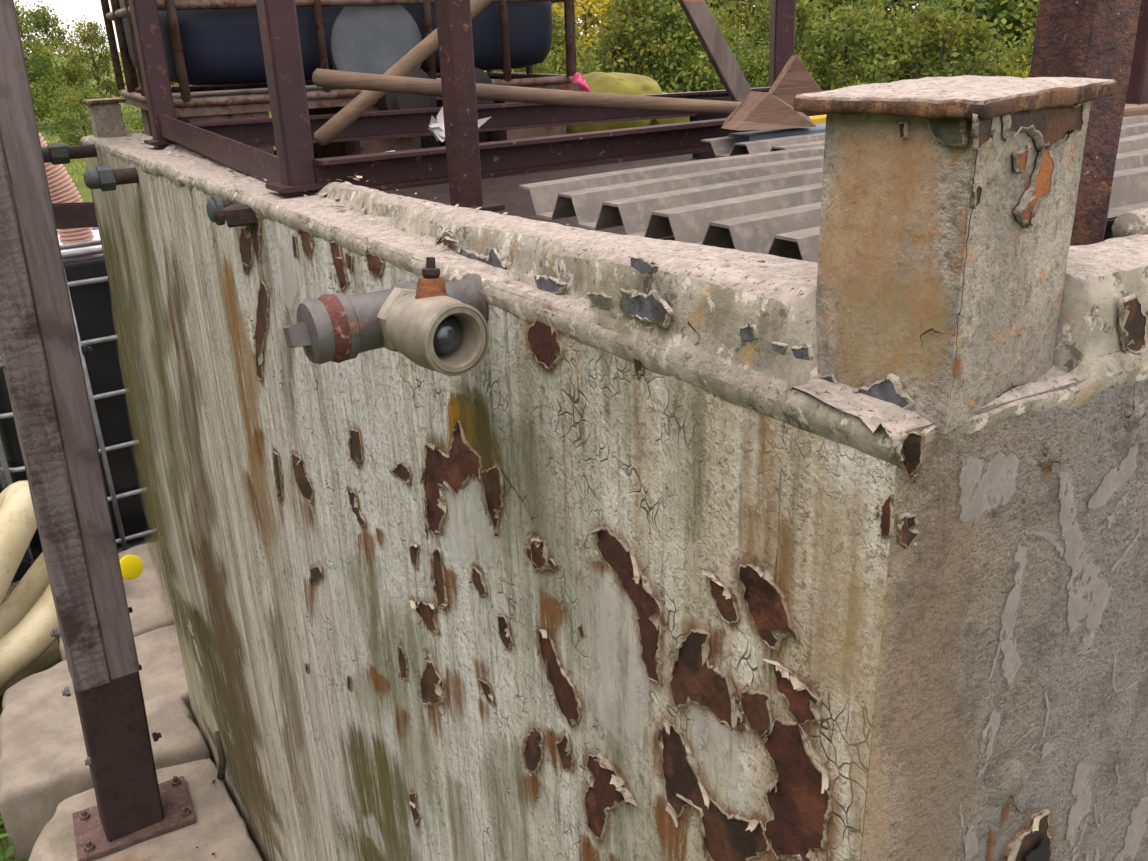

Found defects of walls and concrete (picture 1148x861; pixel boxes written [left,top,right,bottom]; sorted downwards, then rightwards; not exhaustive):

peeling [927,103,1085,229]
peeling [415,230,516,275]
peeling [527,274,567,373]
peeling [581,256,674,328]
peeling [1118,293,1148,355]
peeling [389,417,505,634]
peeling [497,614,515,651]
peeling [522,627,638,842]
peeling [585,524,835,861]
leakage [351,727,390,861]
peeling [1007,816,1042,861]